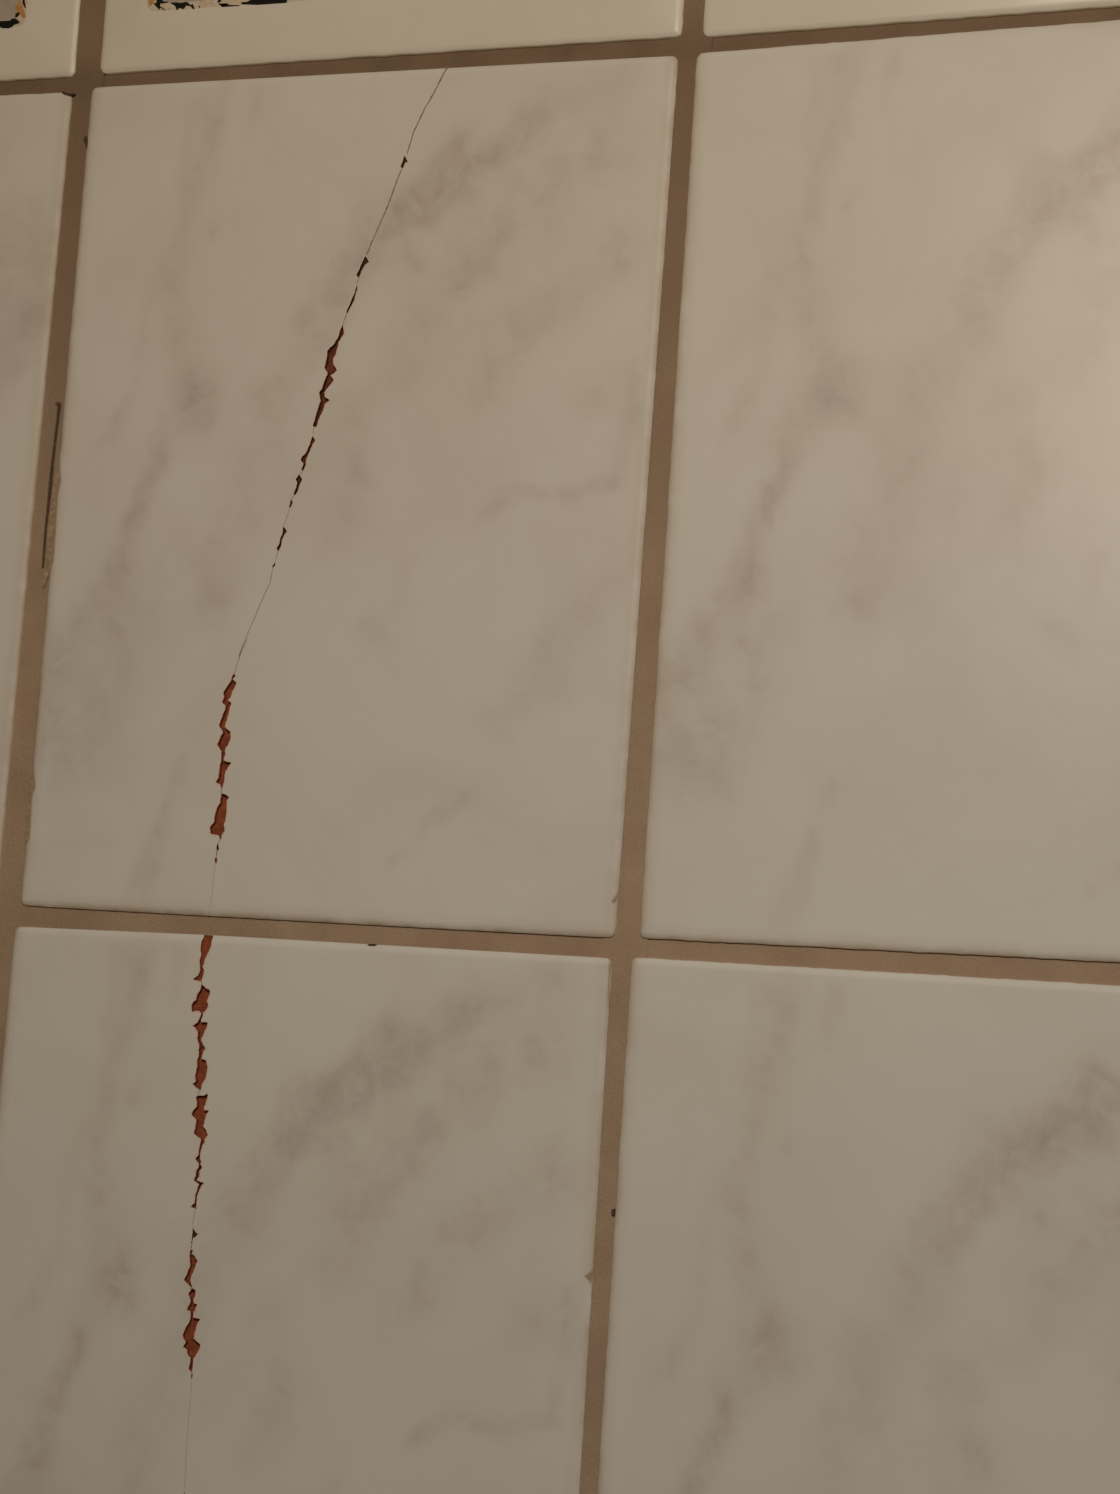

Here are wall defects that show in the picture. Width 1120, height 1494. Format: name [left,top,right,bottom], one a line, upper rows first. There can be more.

crack [182,66,448,1494]